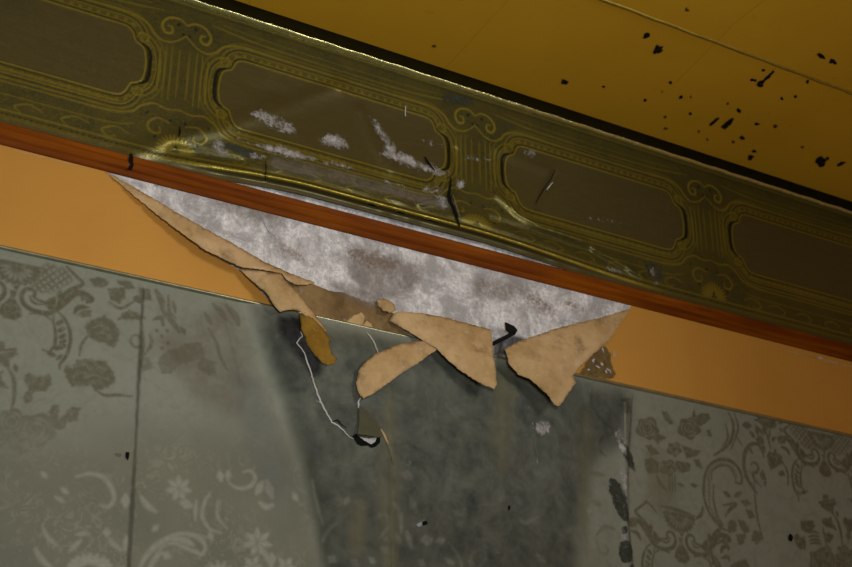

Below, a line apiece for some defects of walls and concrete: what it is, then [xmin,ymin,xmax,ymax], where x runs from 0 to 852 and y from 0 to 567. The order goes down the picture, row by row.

leakage [709,103,741,130]
leakage [815,156,846,167]
crack [297,333,353,439]
leakage [272,317,635,567]